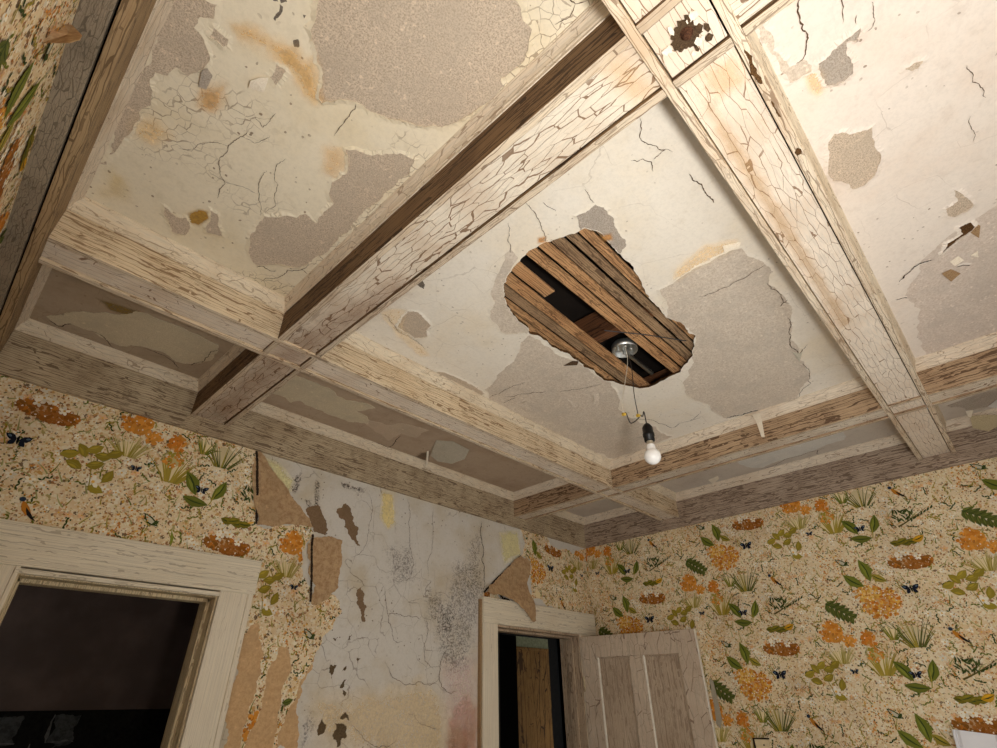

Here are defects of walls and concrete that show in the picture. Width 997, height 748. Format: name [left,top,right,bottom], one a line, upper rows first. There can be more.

peeling [100,0,233,167]
peeling [263,59,292,90]
peeling [293,0,537,133]
crack [796,0,809,64]
peeling [159,202,227,239]
crack [179,113,284,215]
peeling [244,146,419,270]
peeling [905,187,997,355]
peeling [436,246,675,459]
peeling [656,242,813,437]
crack [384,594,456,694]